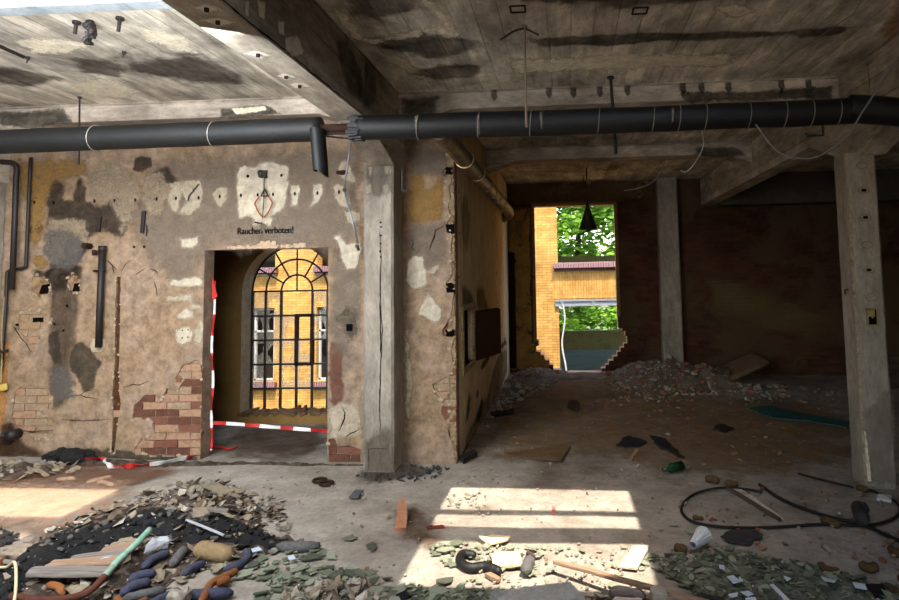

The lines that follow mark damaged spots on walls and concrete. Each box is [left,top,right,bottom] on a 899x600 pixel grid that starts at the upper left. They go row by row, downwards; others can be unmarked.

leakage [73,78,142,98]
leakage [333,0,458,104]
leakage [43,230,86,269]
leakage [48,331,101,404]
crack [339,248,383,468]
flaking render [10,385,53,441]
flaking render [131,360,203,457]
flaking render [326,438,361,462]